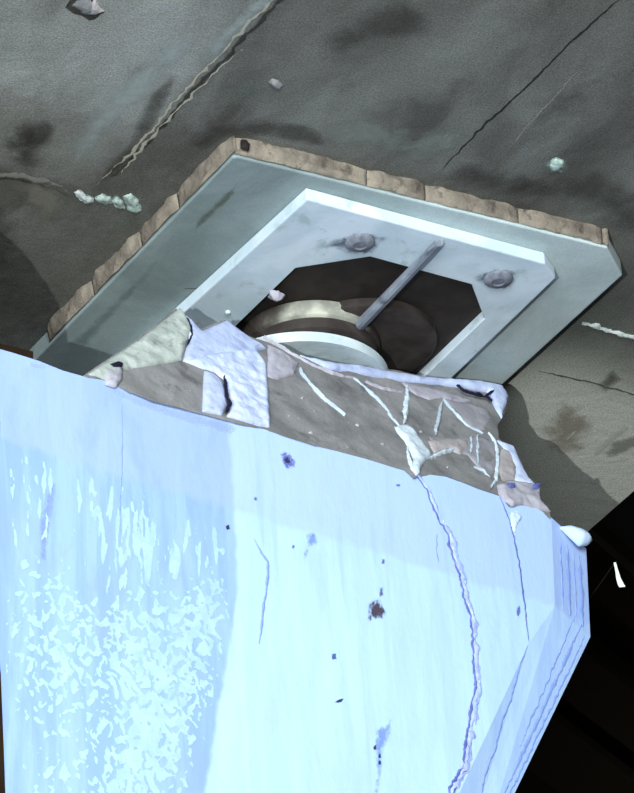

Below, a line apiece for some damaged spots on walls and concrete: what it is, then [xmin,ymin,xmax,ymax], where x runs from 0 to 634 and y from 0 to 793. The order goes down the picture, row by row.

spalling [65,0,105,20]
crack [98,0,283,184]
crack [442,0,619,170]
crack [0,173,66,195]
damp [74,189,142,215]
spalling [83,308,552,518]
crack [545,372,634,395]
peeling [10,461,53,548]
corrosion [370,588,385,619]
crack [415,475,529,793]